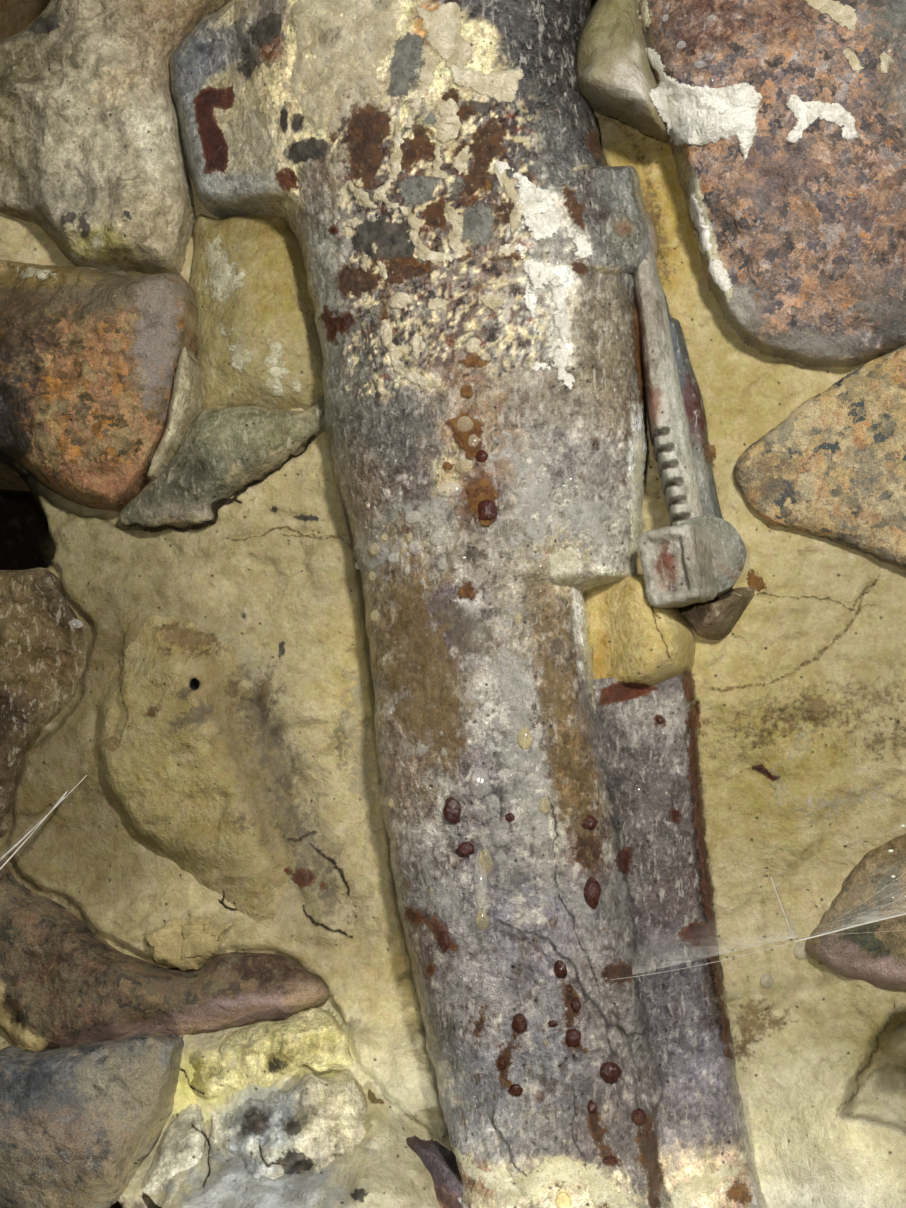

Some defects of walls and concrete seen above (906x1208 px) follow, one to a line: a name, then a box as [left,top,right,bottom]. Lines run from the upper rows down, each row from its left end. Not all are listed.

peeling [226,0,524,263]
peeling [361,243,387,280]
peeling [381,292,449,388]
peeling [466,337,482,353]
peeling [480,292,504,310]
corrosion [442,385,485,471]
crack [712,580,877,691]
corrosion [599,681,658,706]
corrosion [670,667,734,1059]
corrosion [548,960,588,1053]
corrosion [496,1013,527,1097]
corrosion [587,1100,665,1208]